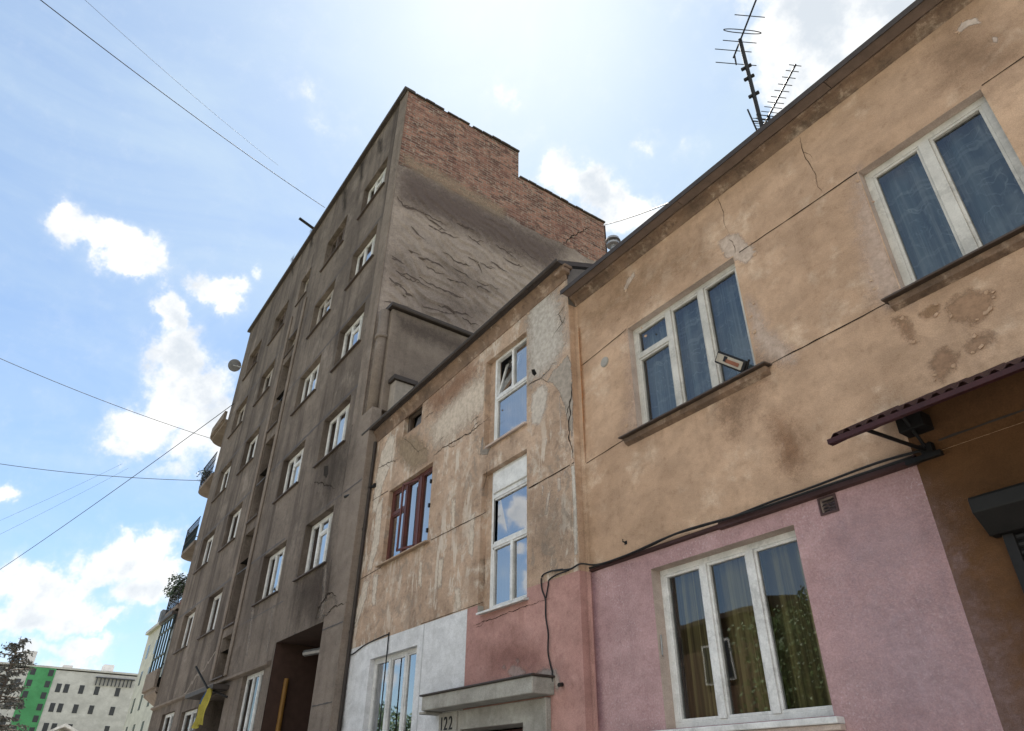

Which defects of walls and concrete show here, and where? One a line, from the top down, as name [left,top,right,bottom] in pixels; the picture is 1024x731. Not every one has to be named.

crack [385,196,532,325]
flaking render [719,233,757,263]
peeling [527,293,573,436]
flaking render [923,290,996,381]
crack [379,417,485,468]
crack [565,387,573,457]